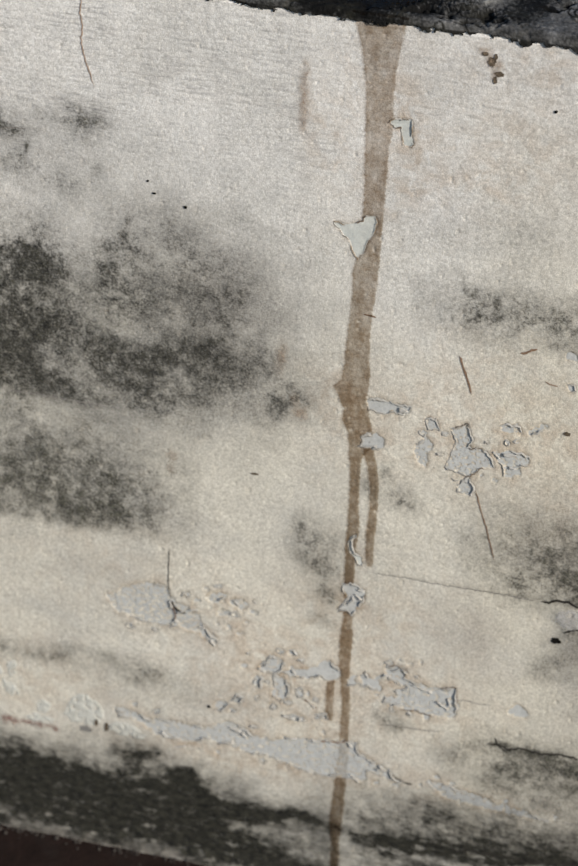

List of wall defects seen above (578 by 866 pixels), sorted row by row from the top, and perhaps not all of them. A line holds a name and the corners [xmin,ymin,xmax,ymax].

peeling [333,215,379,260]
mould [0,219,273,417]
mould [464,289,578,336]
mould [268,383,305,419]
peeling [367,397,413,416]
mould [0,424,158,529]
peeling [357,432,384,451]
peeling [414,417,548,497]
peeling [105,582,257,647]
crack [364,571,578,633]
peeling [64,648,459,787]
damp [0,736,578,866]